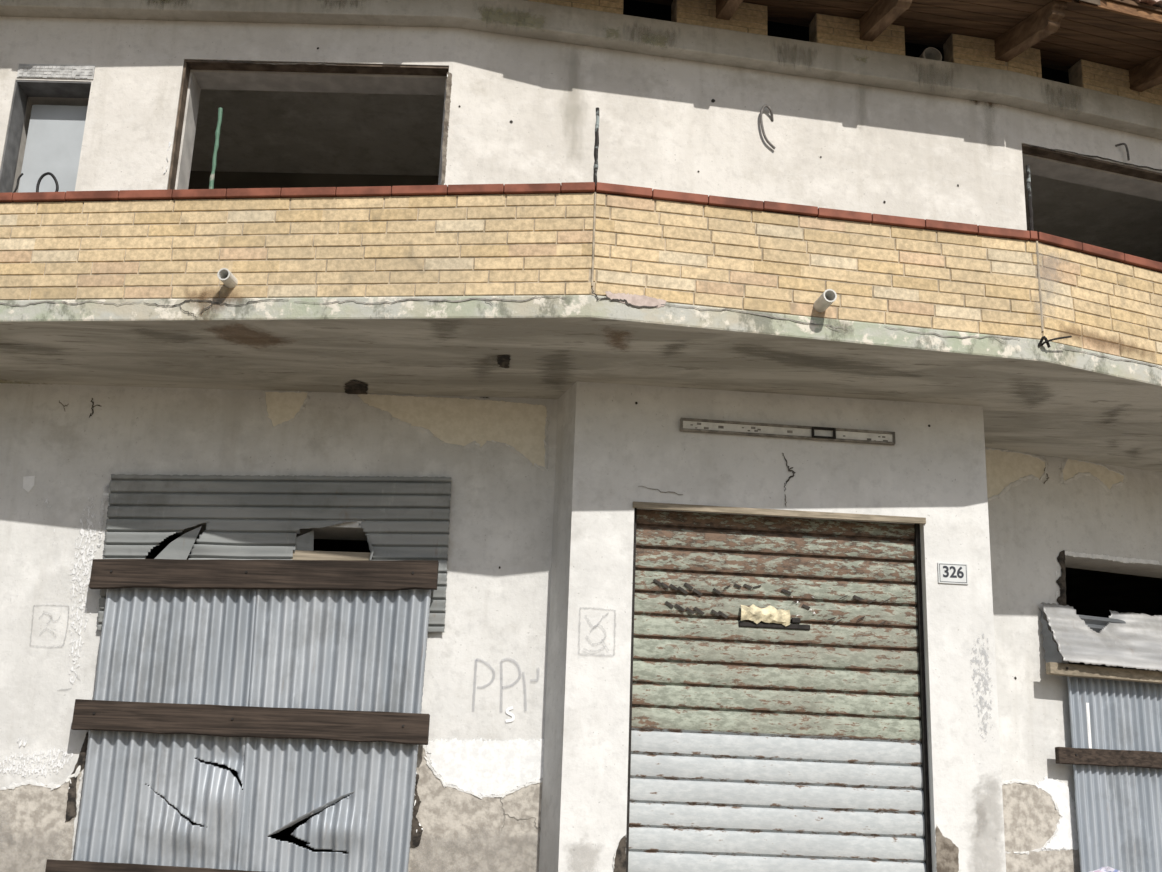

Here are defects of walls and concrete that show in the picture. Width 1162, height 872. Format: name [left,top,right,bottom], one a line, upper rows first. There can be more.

crack [0,288,847,332]
spalling [497,356,511,368]
peeling [260,390,312,429]
peeling [343,380,550,471]
crack [783,453,796,506]
peeling [985,447,1049,501]
peeling [1056,550,1160,606]
flaking render [0,732,88,872]
flaking render [408,737,544,872]
flaking render [1002,776,1080,872]